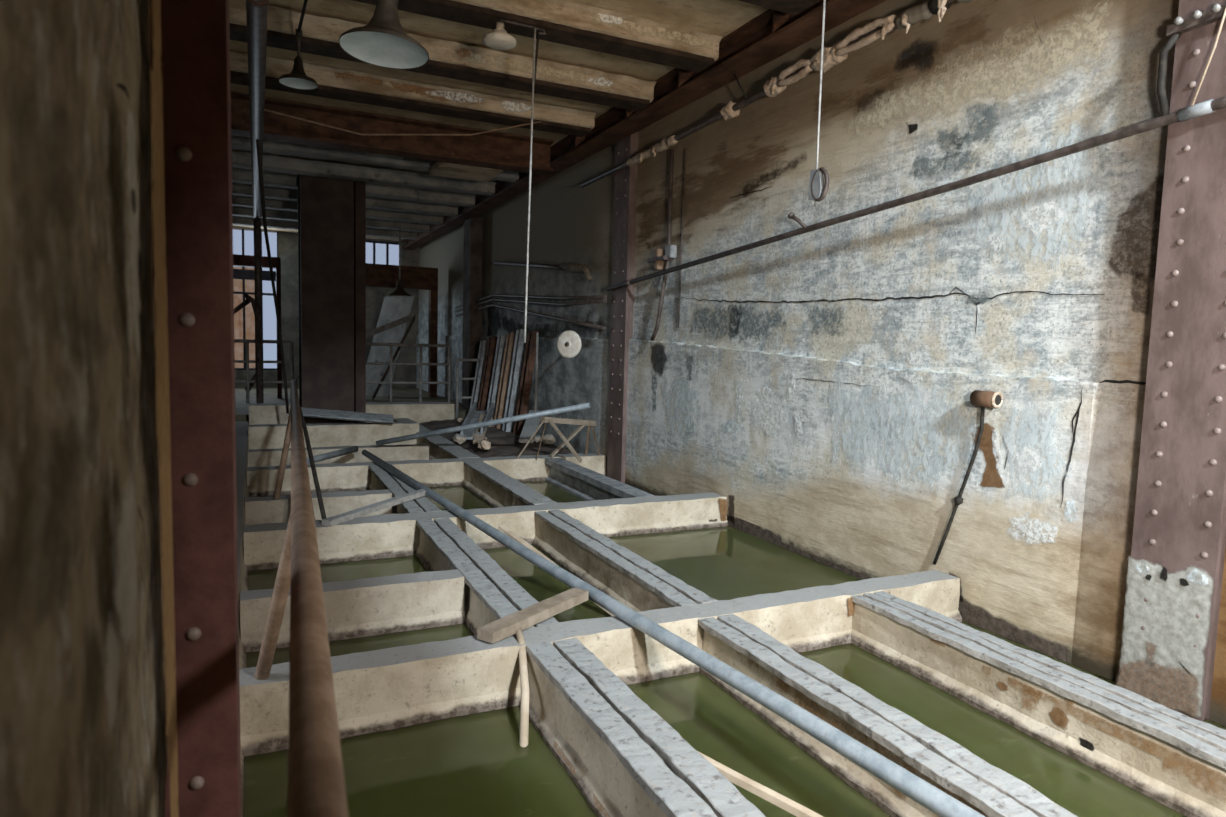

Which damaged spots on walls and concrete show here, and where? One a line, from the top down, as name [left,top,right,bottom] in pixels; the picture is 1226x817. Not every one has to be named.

damp [1109,176,1164,314]
damp [691,305,786,343]
damp [809,305,843,335]
crack [680,287,1105,333]
crack [1060,380,1146,507]